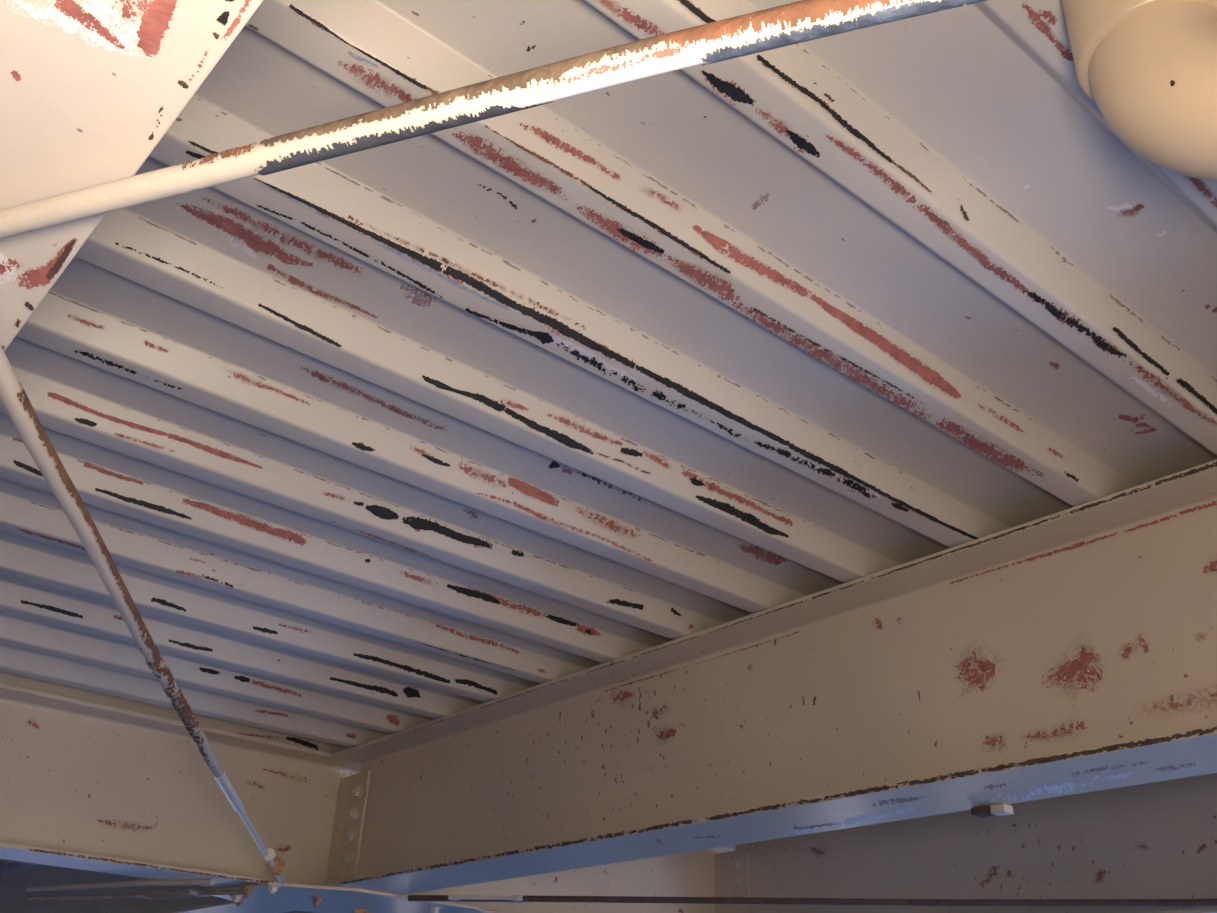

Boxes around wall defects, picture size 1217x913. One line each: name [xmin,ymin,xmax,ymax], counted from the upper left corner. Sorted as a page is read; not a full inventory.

peeling [54,0,178,57]
corrosion [177,0,913,170]
corrosion [485,125,595,189]
peeling [0,237,78,289]
peeling [174,0,1217,540]
peeling [84,462,308,546]
peeling [312,475,524,557]
peeling [410,445,668,561]
corrosion [17,382,218,773]
corrosion [397,461,1217,736]
corrosion [340,727,1217,885]
corrosion [27,848,279,883]